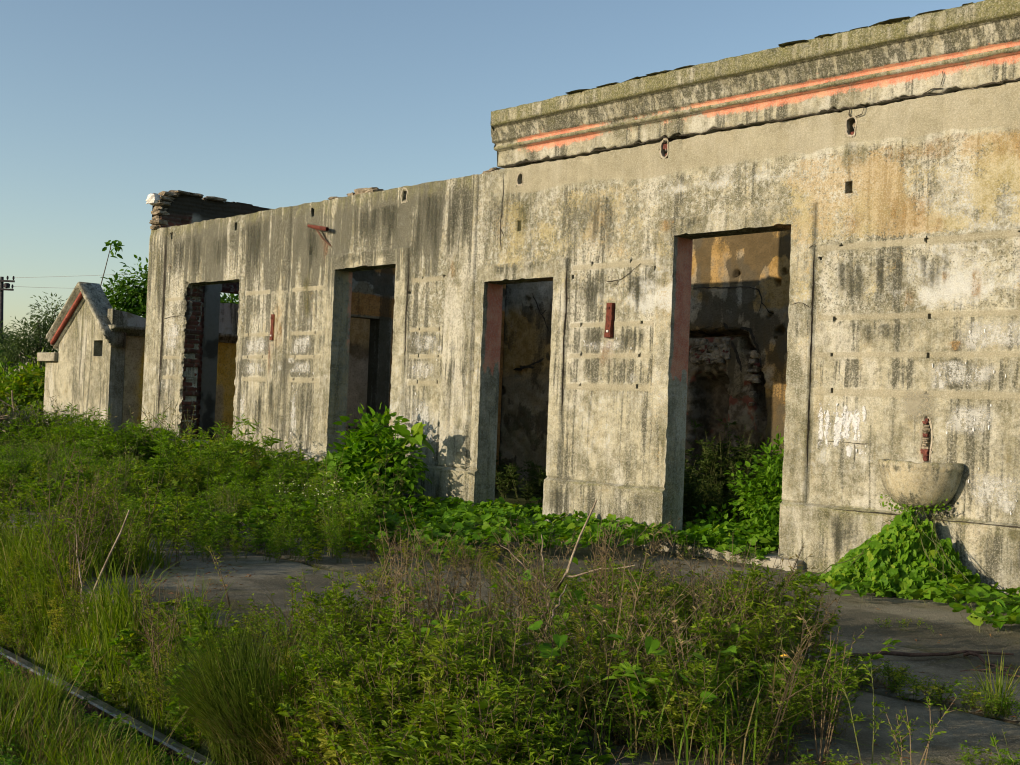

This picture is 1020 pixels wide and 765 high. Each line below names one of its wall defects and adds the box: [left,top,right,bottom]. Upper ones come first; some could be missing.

spalling [149,190,227,230]
spalling [689,337,731,365]
spalling [918,413,933,463]
peeling [946,404,991,434]